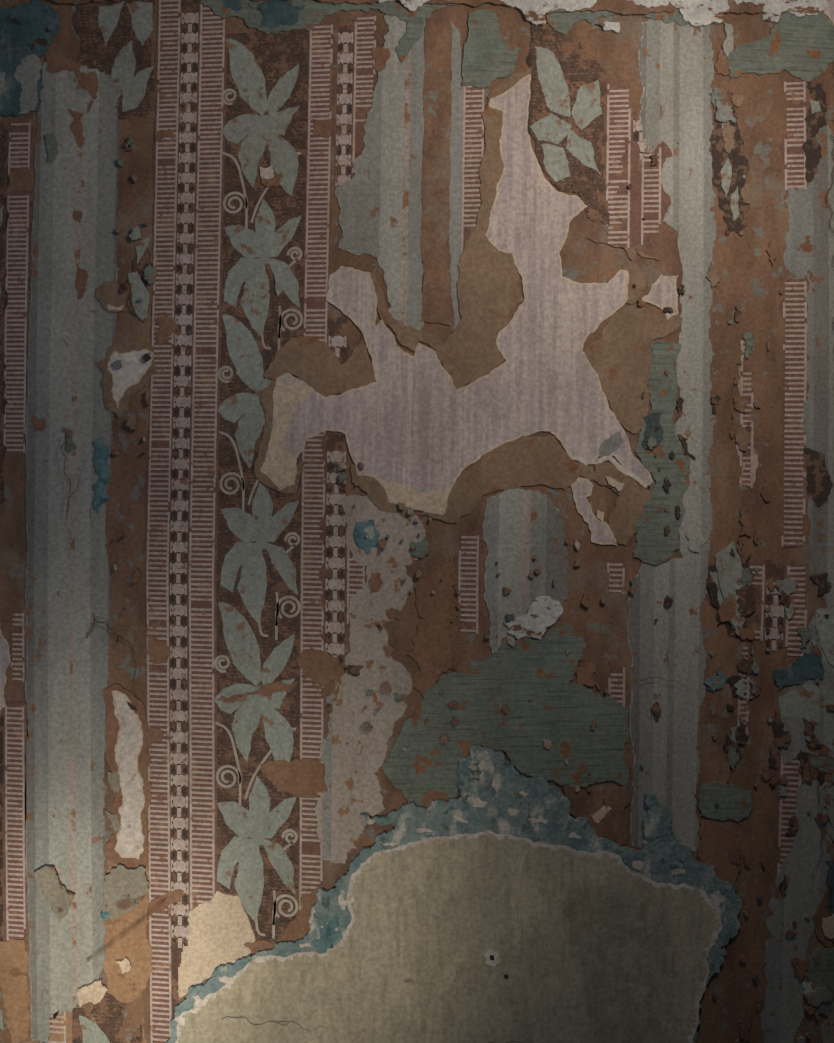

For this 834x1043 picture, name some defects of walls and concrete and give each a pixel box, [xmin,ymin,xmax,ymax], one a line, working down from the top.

peeling [222,0,834,76]
peeling [710,88,745,153]
flaking render [259,166,274,179]
flaking render [271,77,696,523]
flaking render [573,479,616,550]
peeling [504,580,564,647]
flaking render [100,691,149,922]
peeling [590,804,612,823]
crack [221,1016,325,1031]